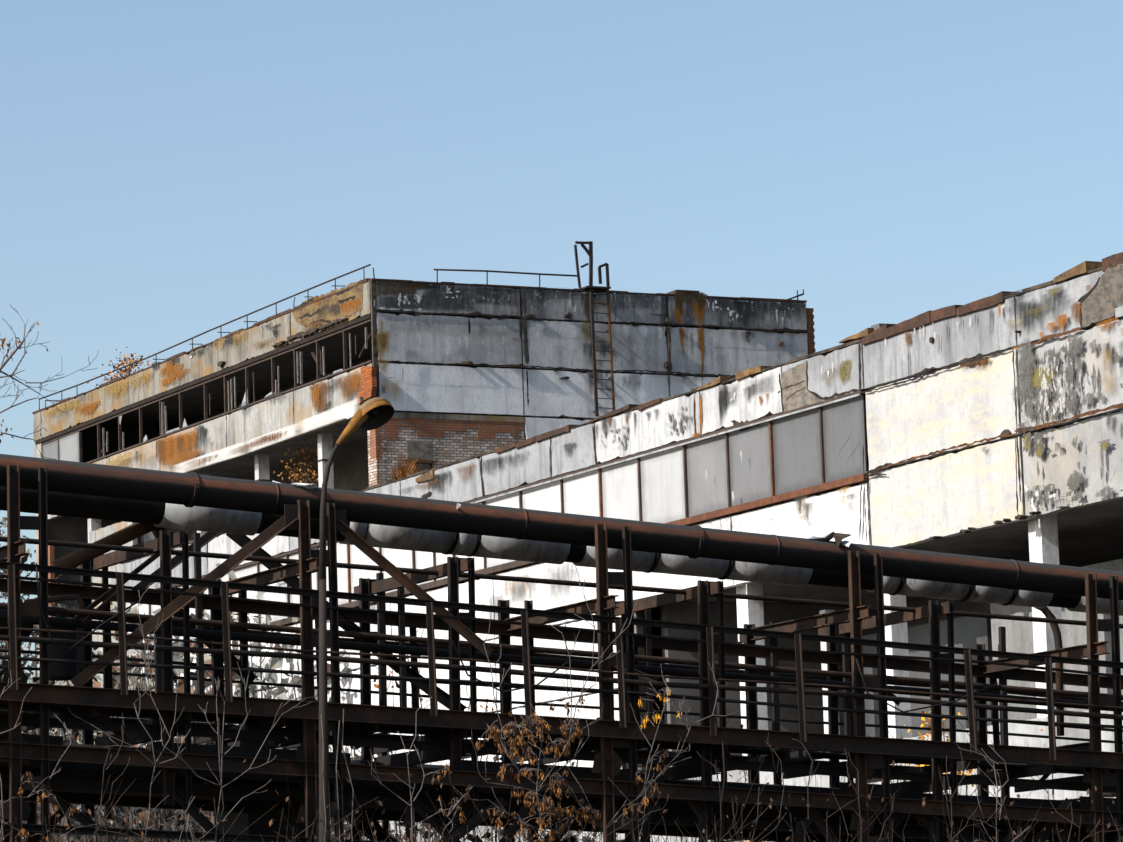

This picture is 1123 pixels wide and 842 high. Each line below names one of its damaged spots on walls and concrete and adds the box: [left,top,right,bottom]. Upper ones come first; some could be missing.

leakage [376,281,609,356]
corrosion [674,291,708,384]
corrosion [162,361,184,385]
corrosion [311,382,327,410]
corrosion [339,372,360,400]
spalling [781,361,860,412]
peeling [993,264,1123,524]
corrosion [156,428,200,464]